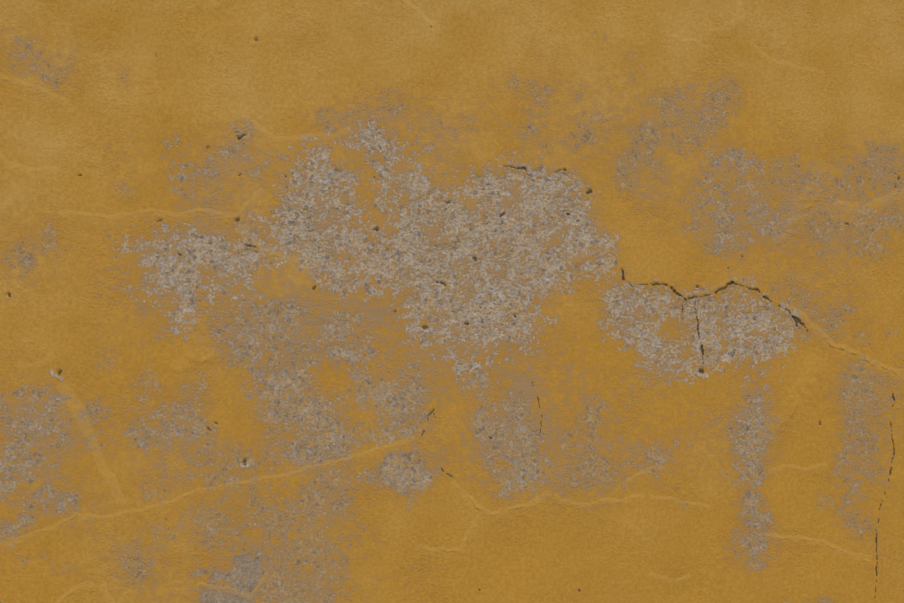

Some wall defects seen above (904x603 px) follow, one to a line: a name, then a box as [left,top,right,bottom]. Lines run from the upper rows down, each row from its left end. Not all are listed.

peeling [655,76,904,262]
peeling [0,369,114,525]
peeling [91,80,826,601]
crack [621,269,904,592]